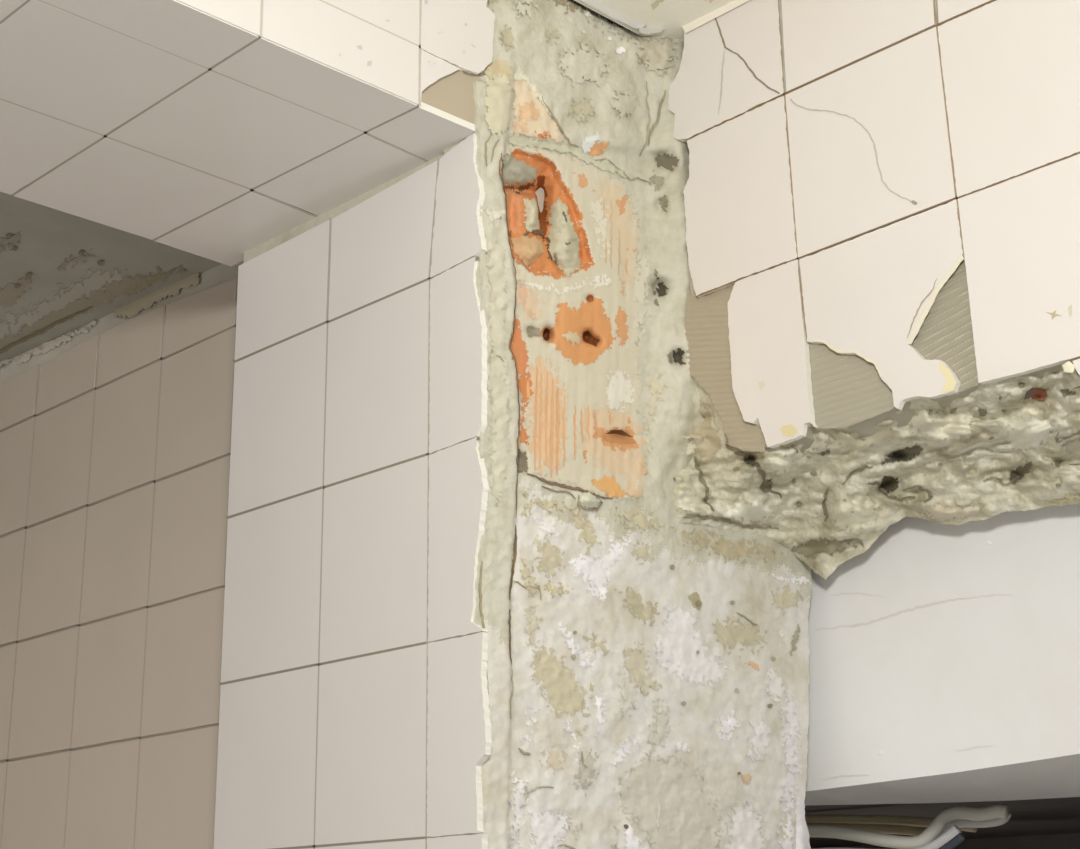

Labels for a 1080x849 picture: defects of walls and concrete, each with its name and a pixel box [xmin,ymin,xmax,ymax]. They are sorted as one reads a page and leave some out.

peeling [548,0,677,44]
crack [714,18,911,202]
flaking render [16,320,97,364]
spalling [501,131,1080,580]
crack [478,134,613,719]
peeling [520,534,594,736]
peeling [573,631,610,656]
peeling [614,587,660,627]
peeling [623,642,661,696]
peeling [688,592,703,610]
peeling [712,600,768,655]
peeling [770,584,803,616]